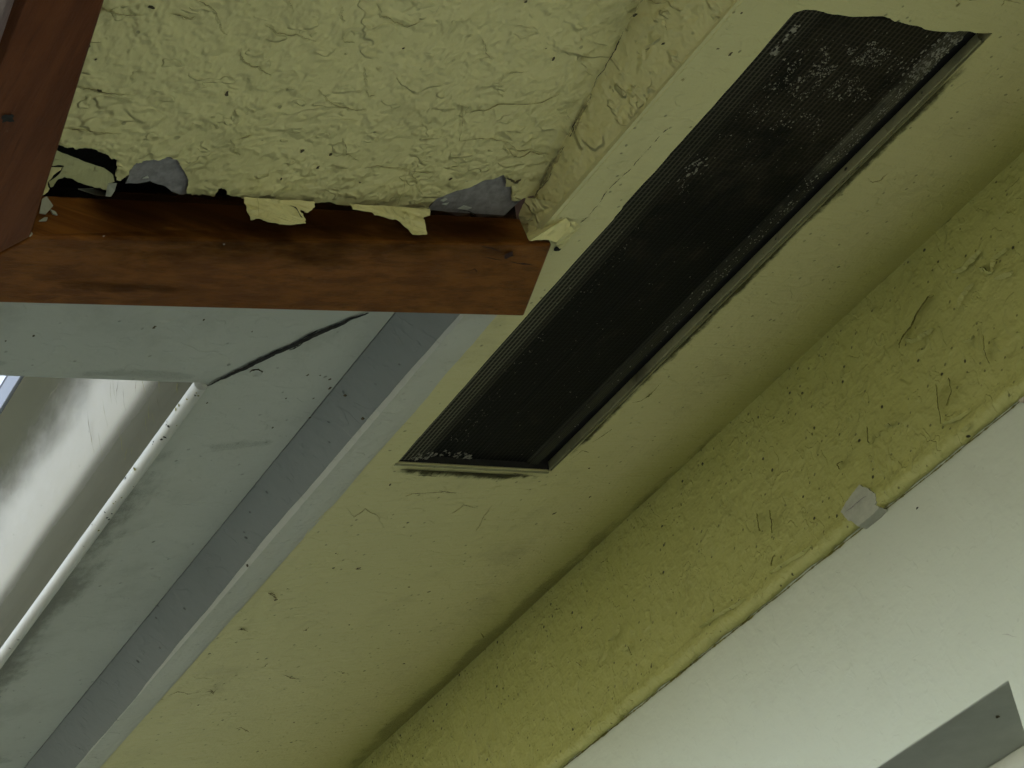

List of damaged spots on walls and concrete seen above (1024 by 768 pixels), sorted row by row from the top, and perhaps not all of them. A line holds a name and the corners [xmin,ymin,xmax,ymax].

peeling [39,151,188,222]
peeling [244,194,315,225]
spalling [350,173,580,249]
crack [207,313,368,386]
spalling [841,485,888,529]